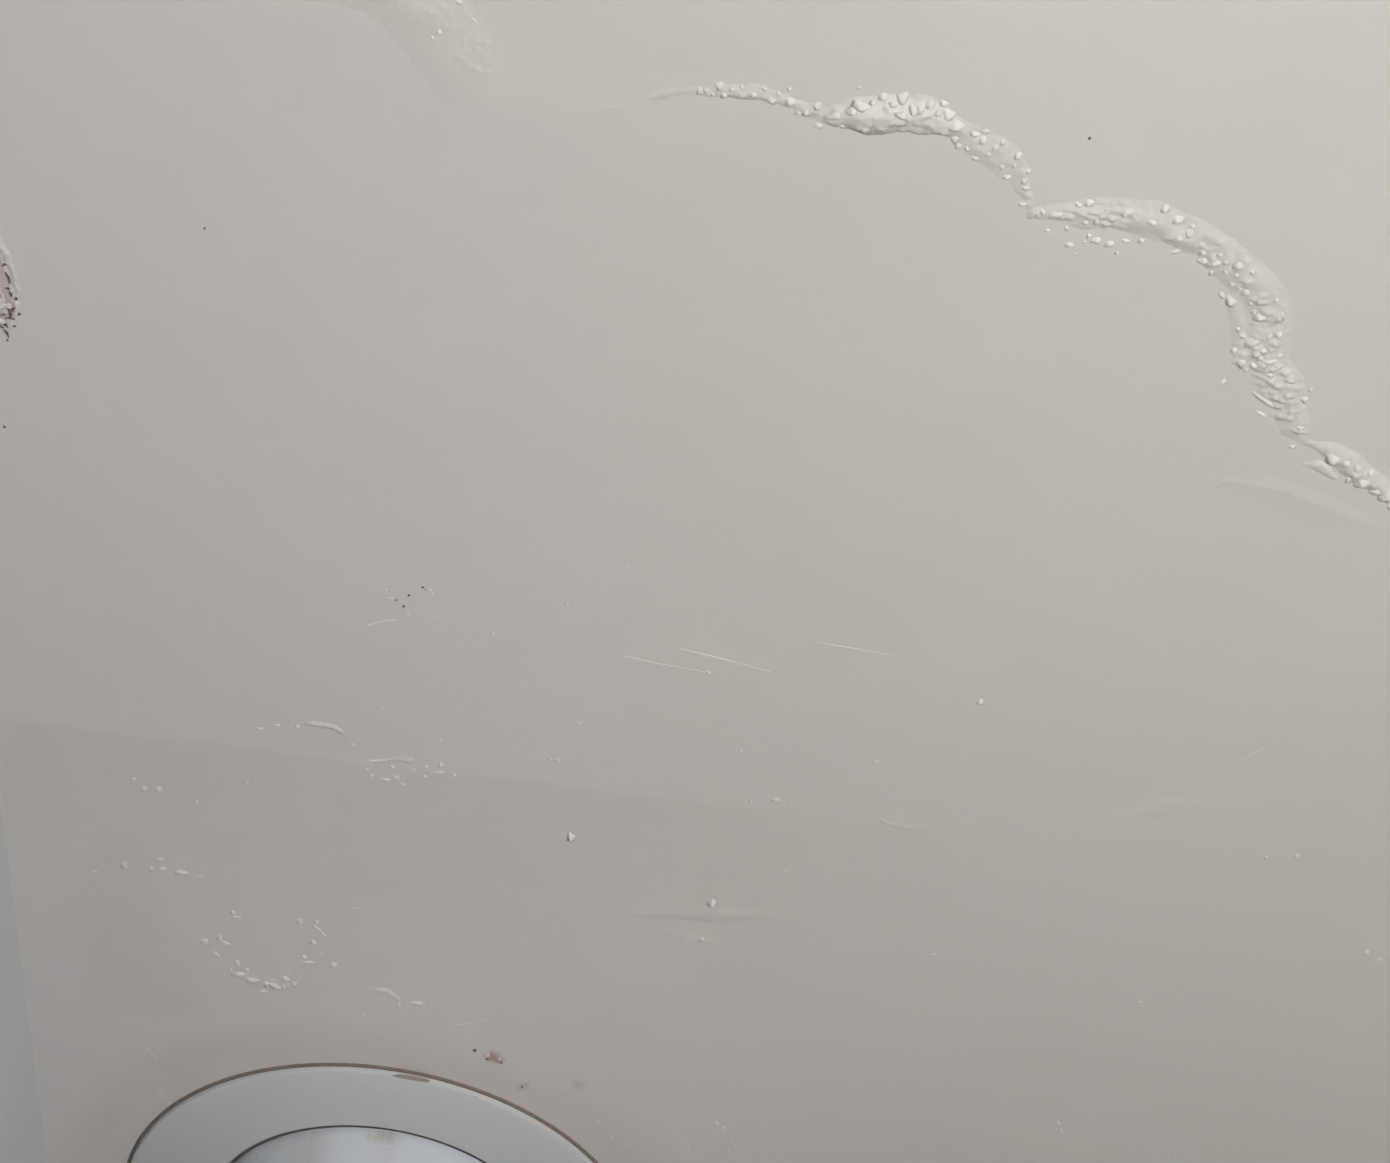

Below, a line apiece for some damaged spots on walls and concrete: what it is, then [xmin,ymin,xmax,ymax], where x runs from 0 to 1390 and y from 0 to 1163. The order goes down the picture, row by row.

peeling [0,222,21,341]